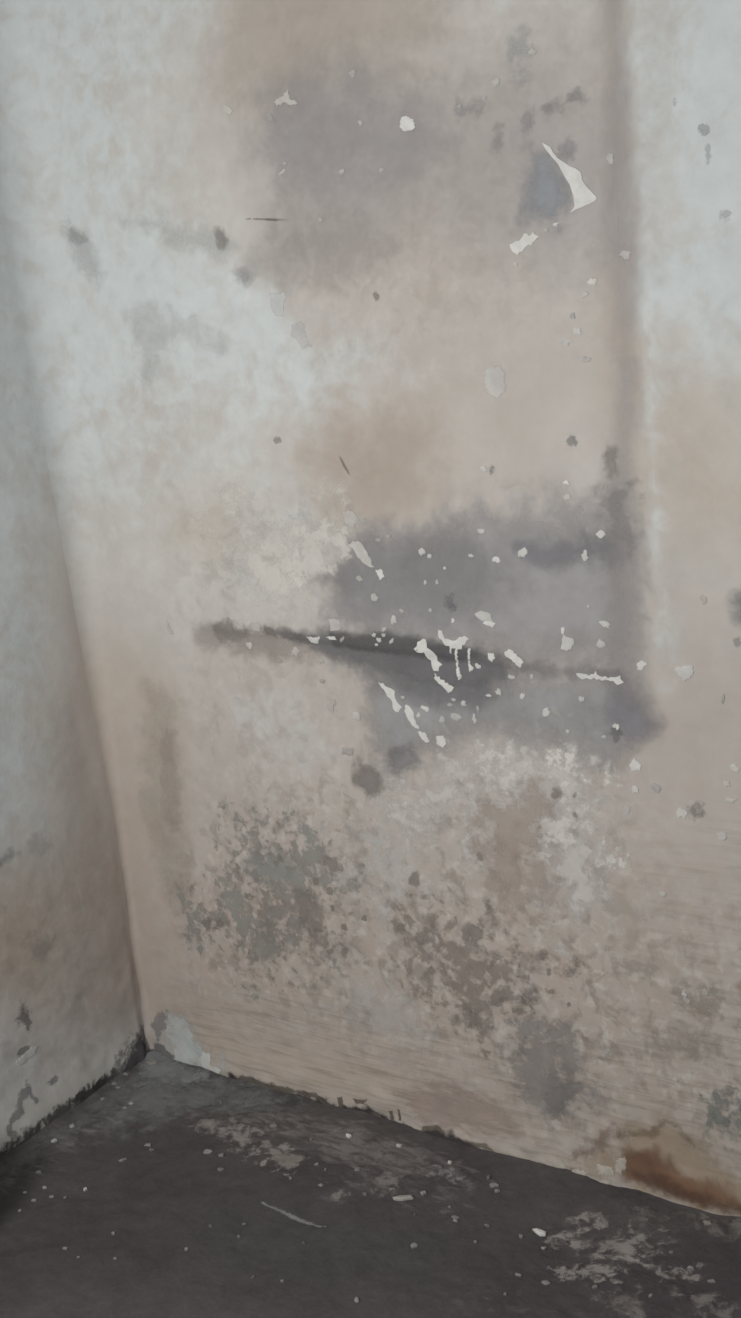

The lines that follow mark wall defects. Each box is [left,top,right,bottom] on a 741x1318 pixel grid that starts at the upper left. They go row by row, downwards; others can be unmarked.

peeling [510,143,597,266]
peeling [277,618,344,663]
crack [198,622,504,695]
flaking render [372,609,405,646]
leakage [177,806,364,984]
leakage [393,788,595,1116]
peeling [200,1052,221,1074]
rust [597,1125,741,1208]